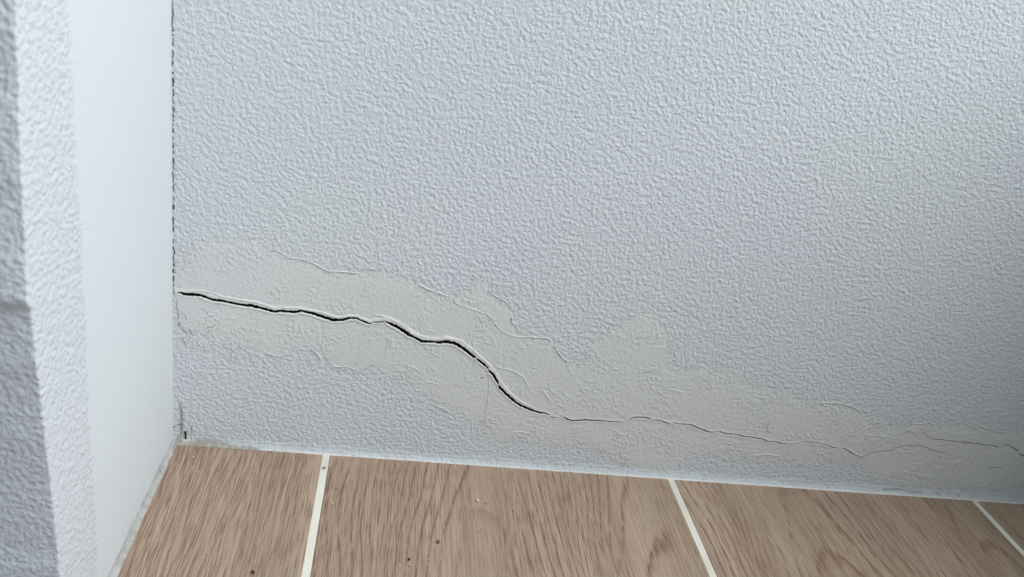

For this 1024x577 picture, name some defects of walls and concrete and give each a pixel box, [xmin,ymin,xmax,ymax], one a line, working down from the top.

crack [172,0,1024,461]